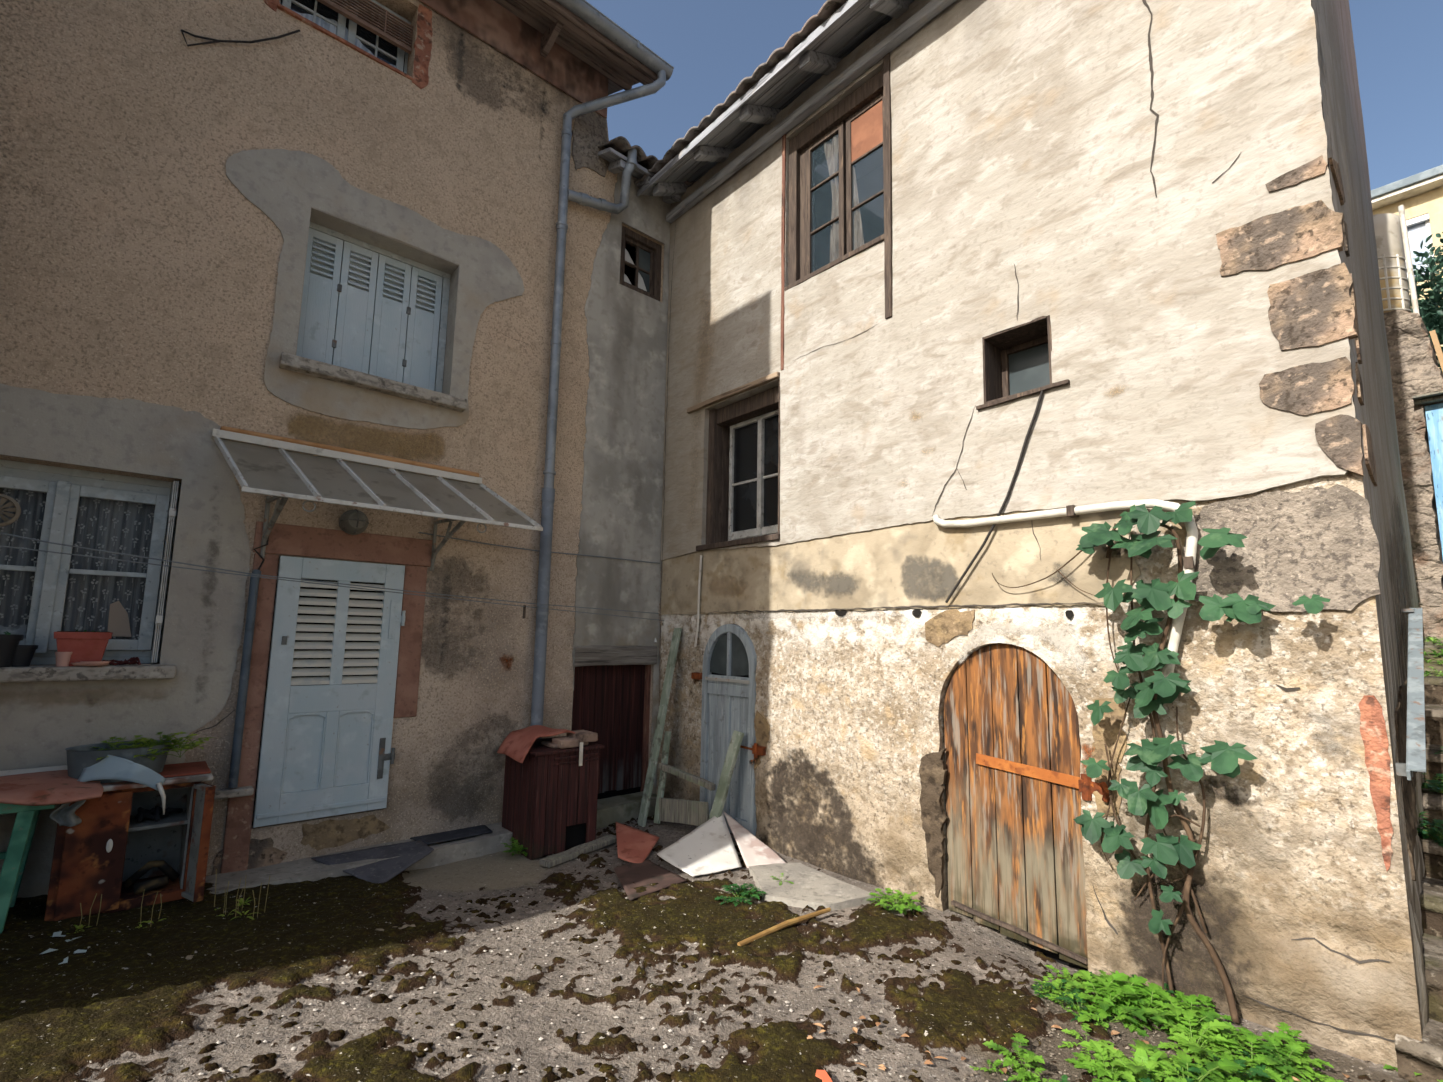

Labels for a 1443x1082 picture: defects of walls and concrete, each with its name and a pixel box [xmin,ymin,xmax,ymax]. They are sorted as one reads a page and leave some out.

crack [1142,0,1159,197]
water stain [791,572,857,594]
water stain [902,557,958,601]
water stain [766,749,881,887]
flaking render [1358,679,1417,881]